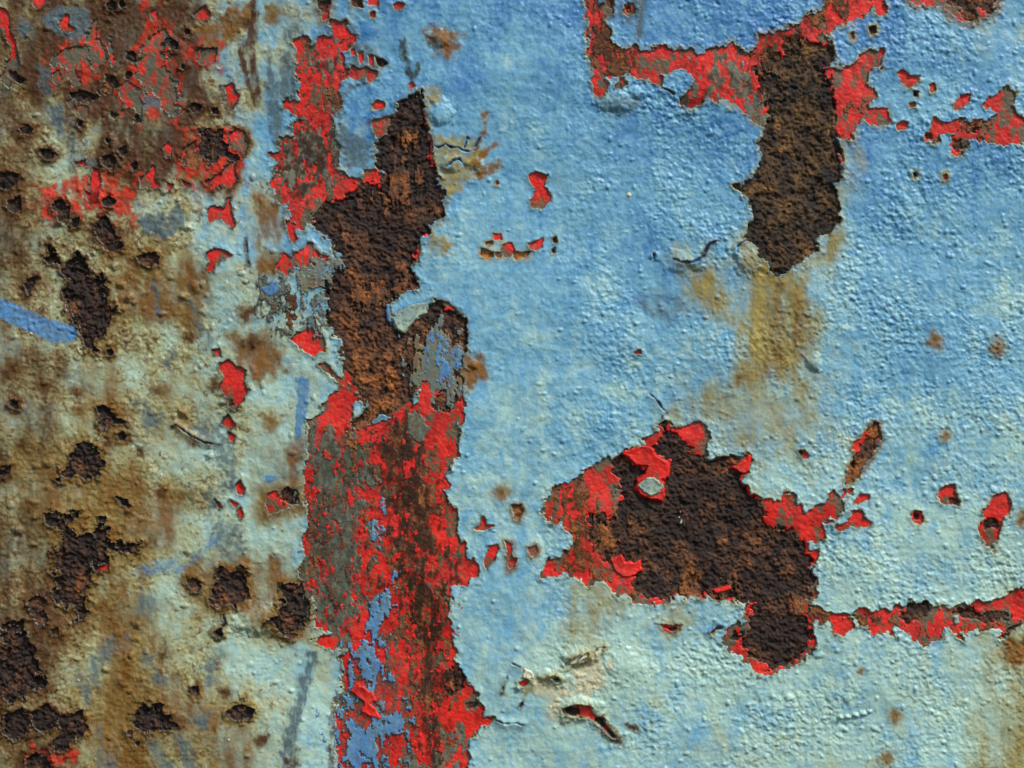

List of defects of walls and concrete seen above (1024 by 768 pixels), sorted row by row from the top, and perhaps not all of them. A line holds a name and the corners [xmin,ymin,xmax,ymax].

peeling [909,0,996,23]
peeling [584,0,907,277]
peeling [924,86,1024,156]
peeling [529,172,551,209]
peeling [481,234,556,260]
rust [688,259,727,317]
rust [736,230,844,419]
rust [0,0,288,768]
peeling [248,0,517,768]
peeling [528,420,1024,675]
rust [181,554,312,642]
peeling [562,705,616,737]